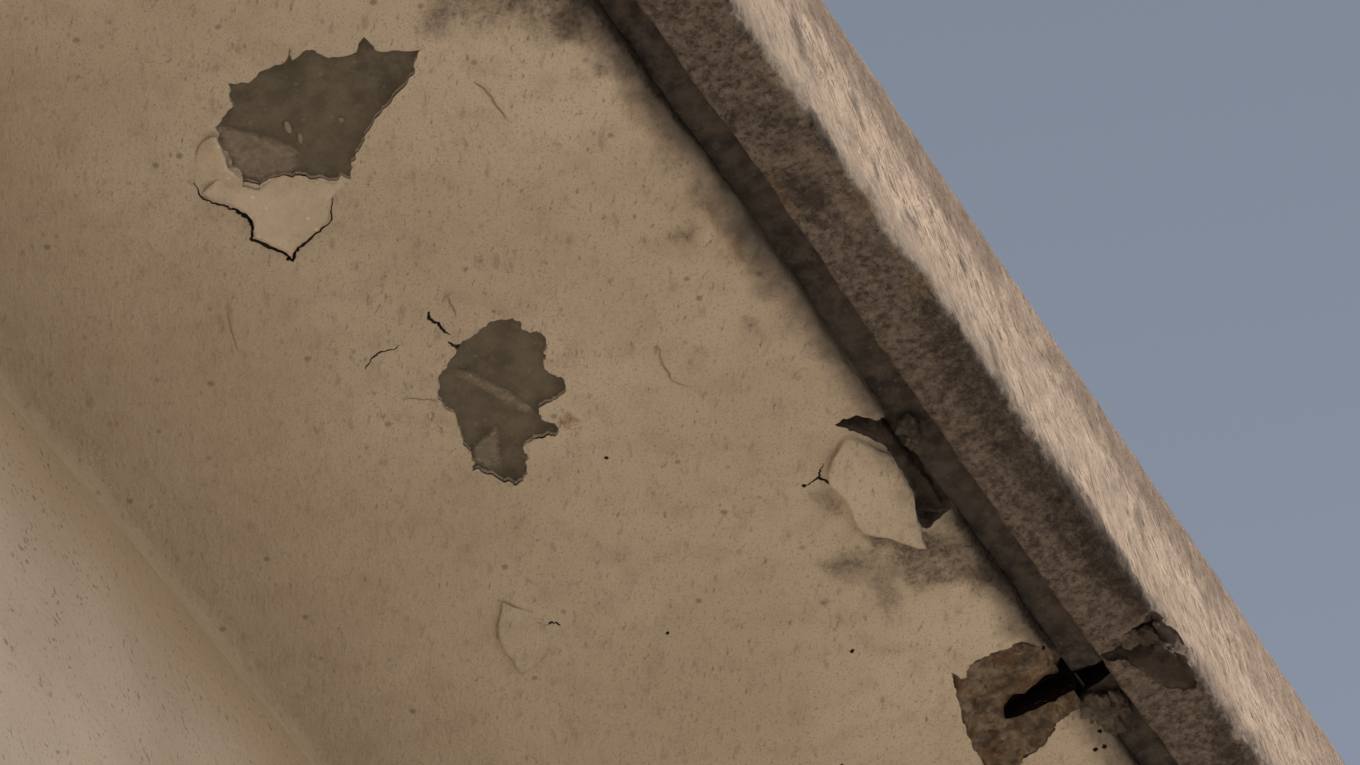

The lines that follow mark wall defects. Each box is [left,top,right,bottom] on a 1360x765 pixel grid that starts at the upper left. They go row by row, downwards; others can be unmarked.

peeling [193,37,421,262]
peeling [437,318,566,484]
spalling [828,404,952,549]
spalling [951,611,1197,765]